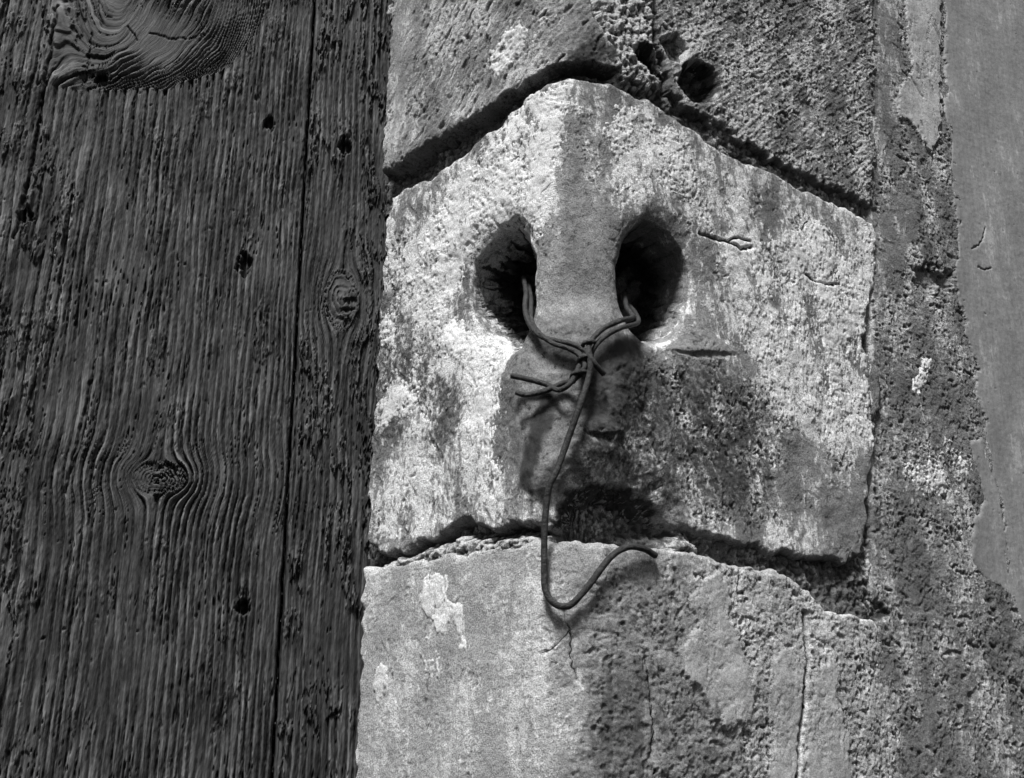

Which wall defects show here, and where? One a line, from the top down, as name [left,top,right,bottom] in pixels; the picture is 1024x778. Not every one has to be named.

crack [698,234,750,250]
crack [542,612,577,679]